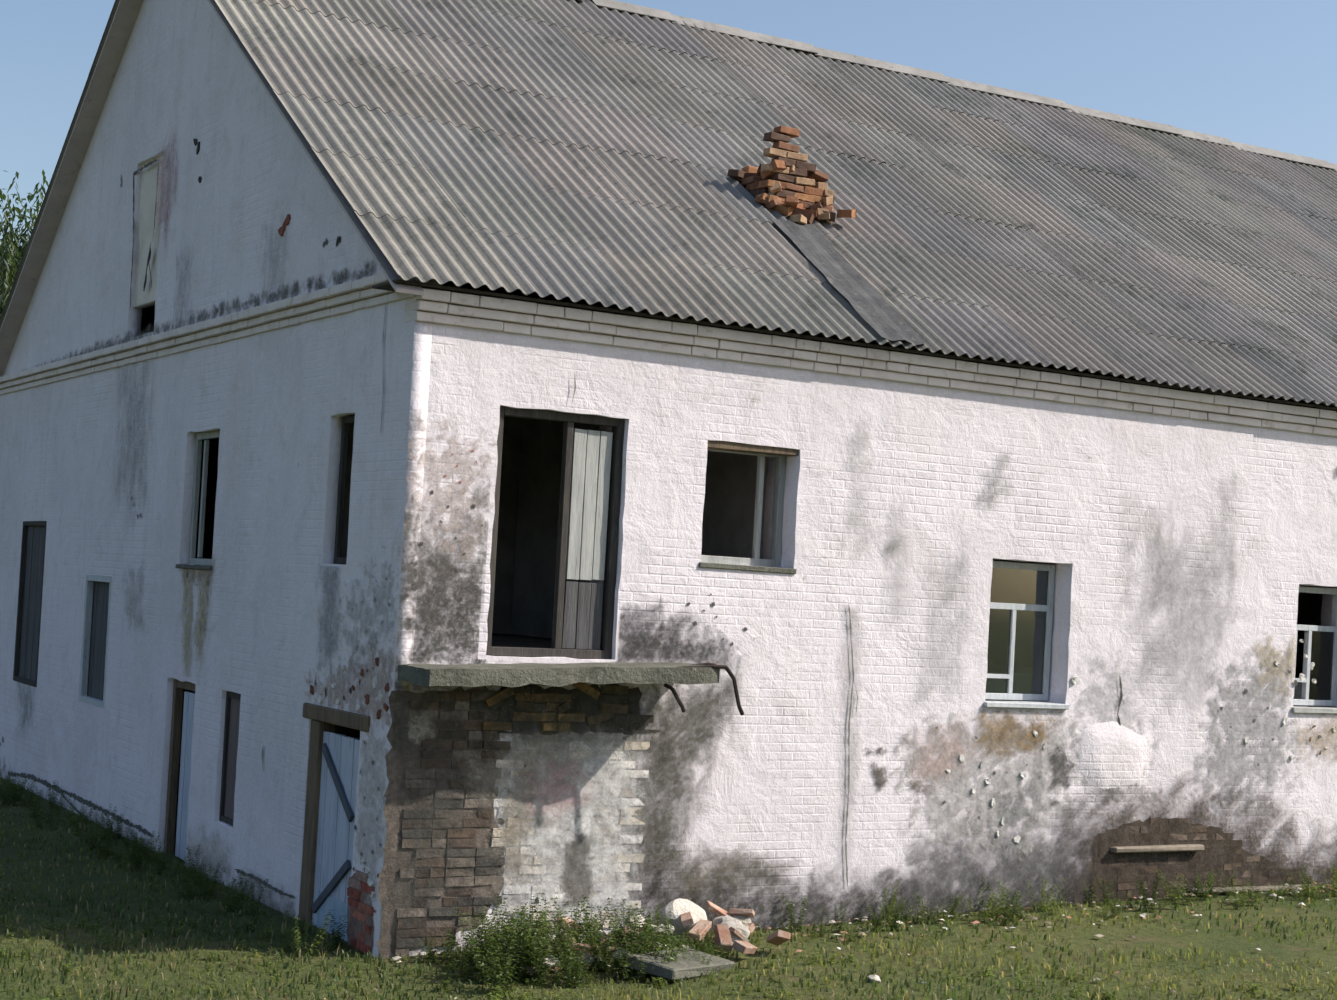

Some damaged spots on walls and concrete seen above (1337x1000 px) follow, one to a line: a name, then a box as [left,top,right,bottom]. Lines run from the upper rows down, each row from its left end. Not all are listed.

leakage [396,493,489,665]
leakage [620,593,733,662]
flaking render [306,563,660,959]
leakage [631,676,1090,933]